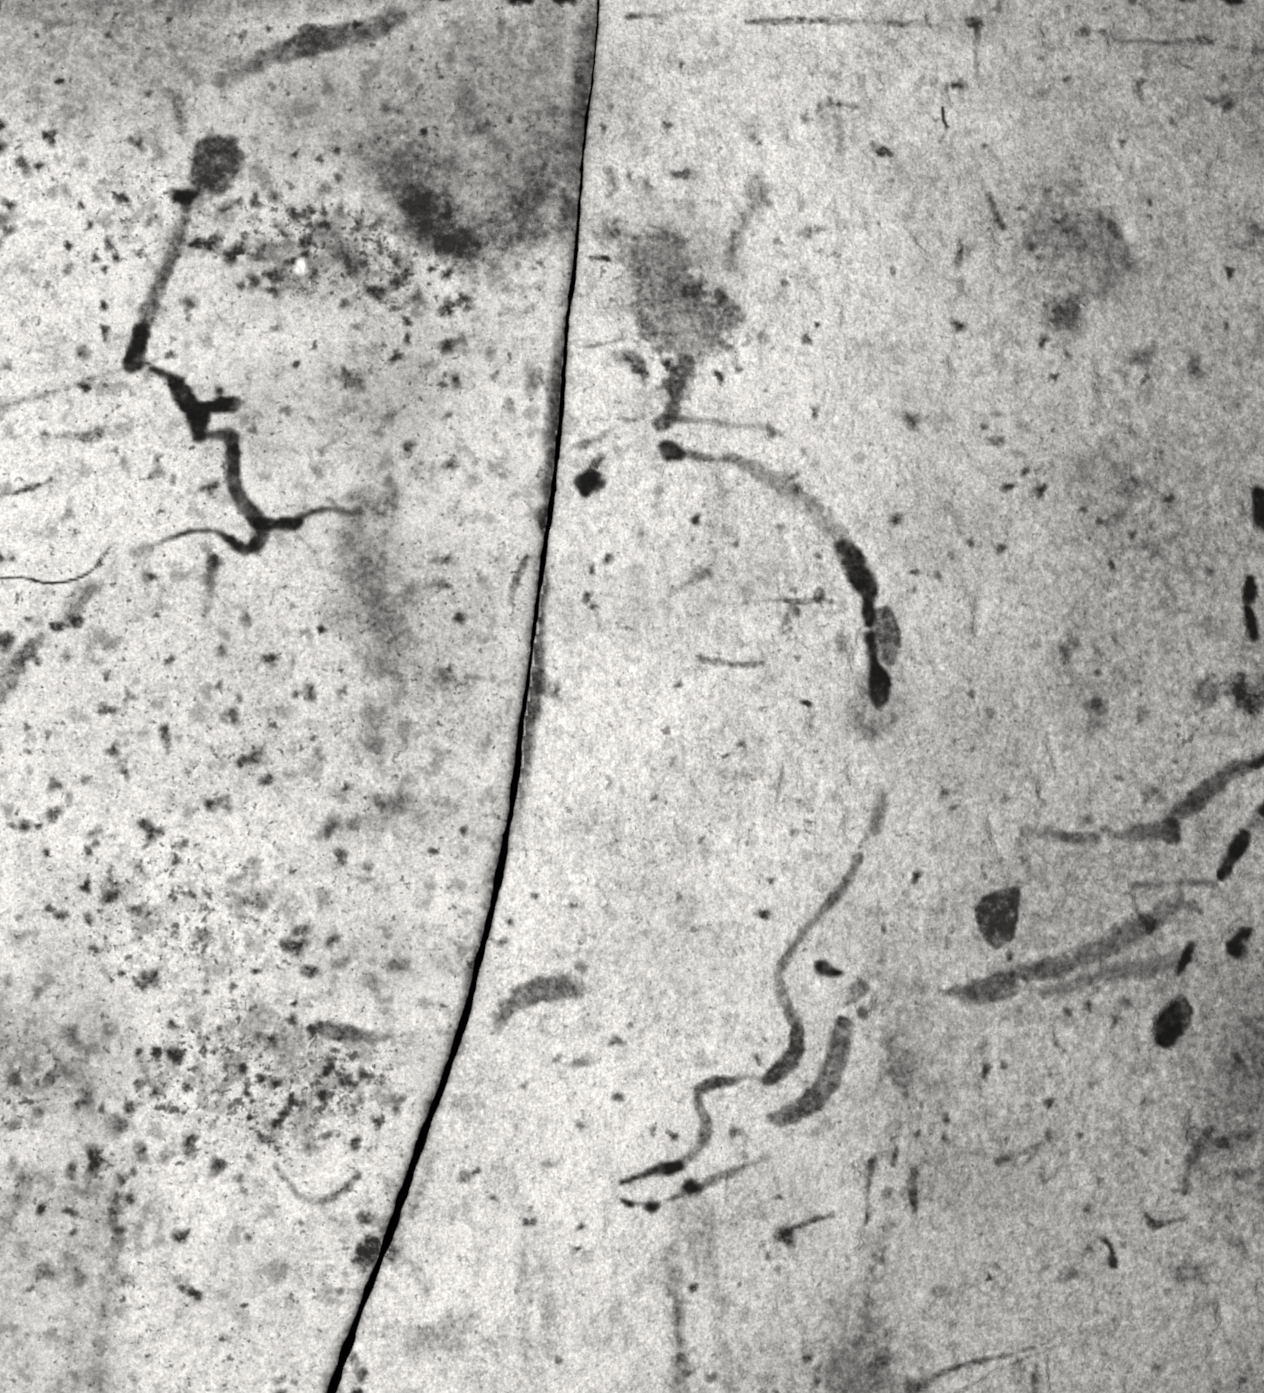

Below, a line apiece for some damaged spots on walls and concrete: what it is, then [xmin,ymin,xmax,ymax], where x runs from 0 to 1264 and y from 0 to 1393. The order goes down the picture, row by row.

crack [122,204,344,585]
crack [327,0,600,1393]